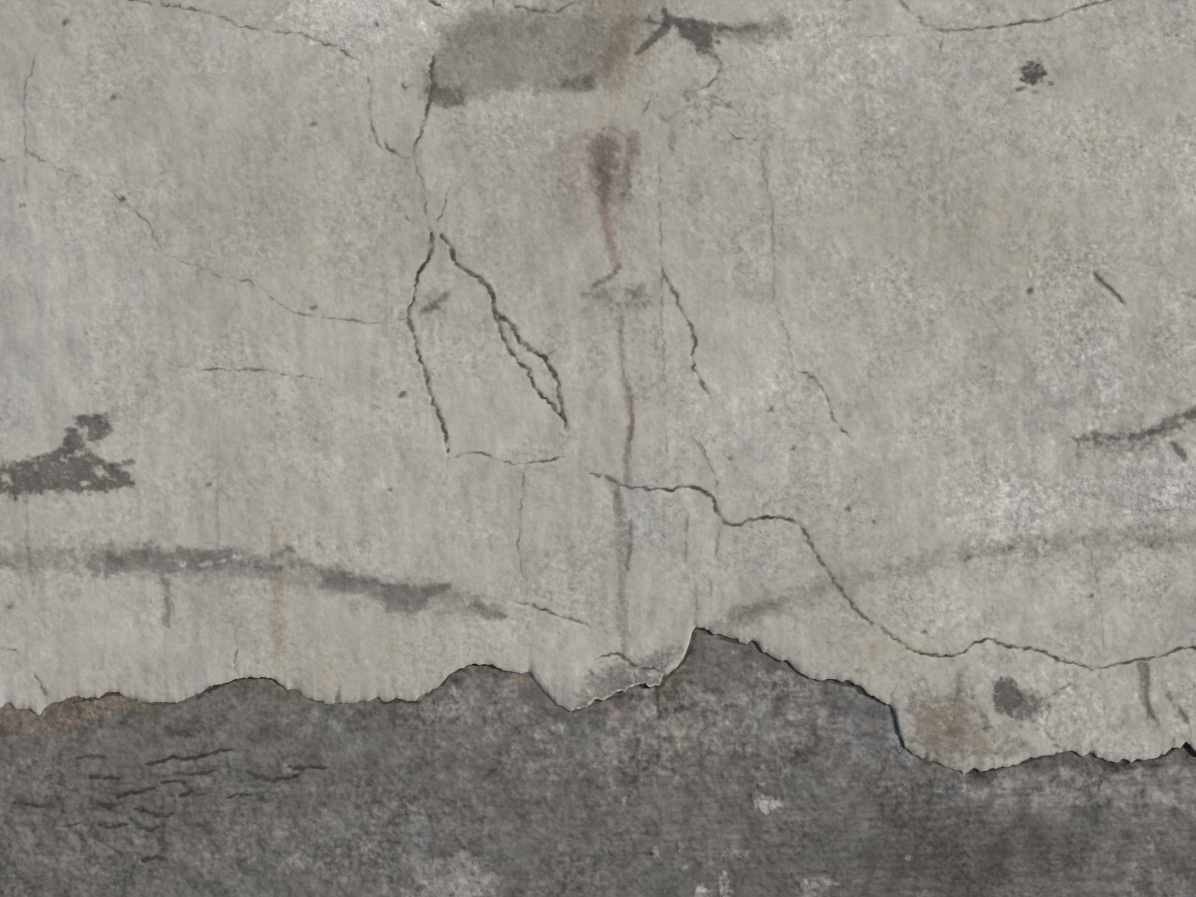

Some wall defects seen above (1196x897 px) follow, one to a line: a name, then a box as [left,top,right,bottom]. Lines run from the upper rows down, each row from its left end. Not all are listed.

crack [373,56,435,172]
damp [425,82,461,107]
crack [407,232,567,456]
crack [664,275,707,391]
flaking render [0,413,134,500]
flaking render [1073,409,1196,458]
crack [591,473,1196,668]
flaking render [0,692,156,742]
crack [590,609,738,716]
crack [833,681,874,699]
flaking render [993,678,1046,724]
peeling [719,848,746,897]